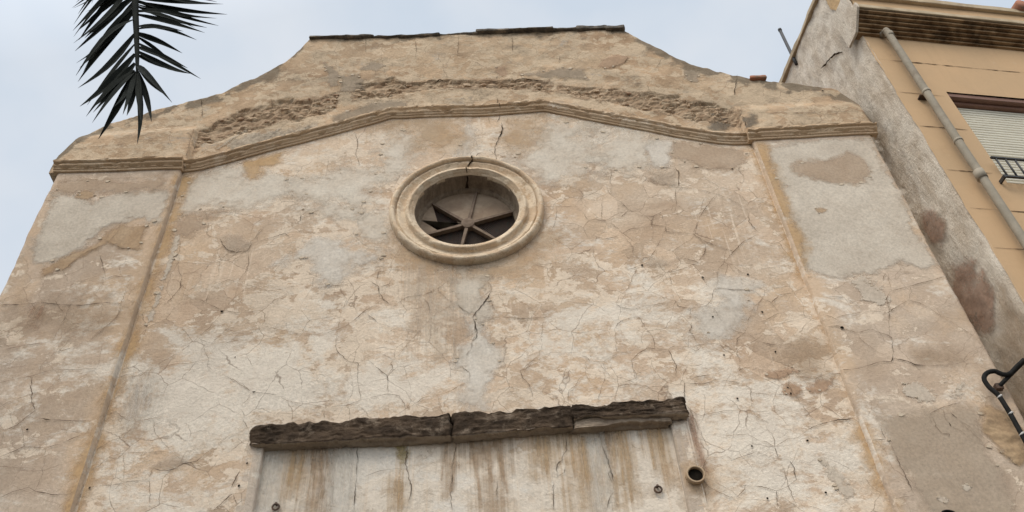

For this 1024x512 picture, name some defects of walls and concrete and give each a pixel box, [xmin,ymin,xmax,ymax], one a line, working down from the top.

peeling [31,129,422,275]
spalling [187,62,742,157]
crack [437,78,538,188]
peeling [504,113,676,183]
crack [0,215,545,510]
crack [551,162,942,510]
peeling [877,405,1024,512]